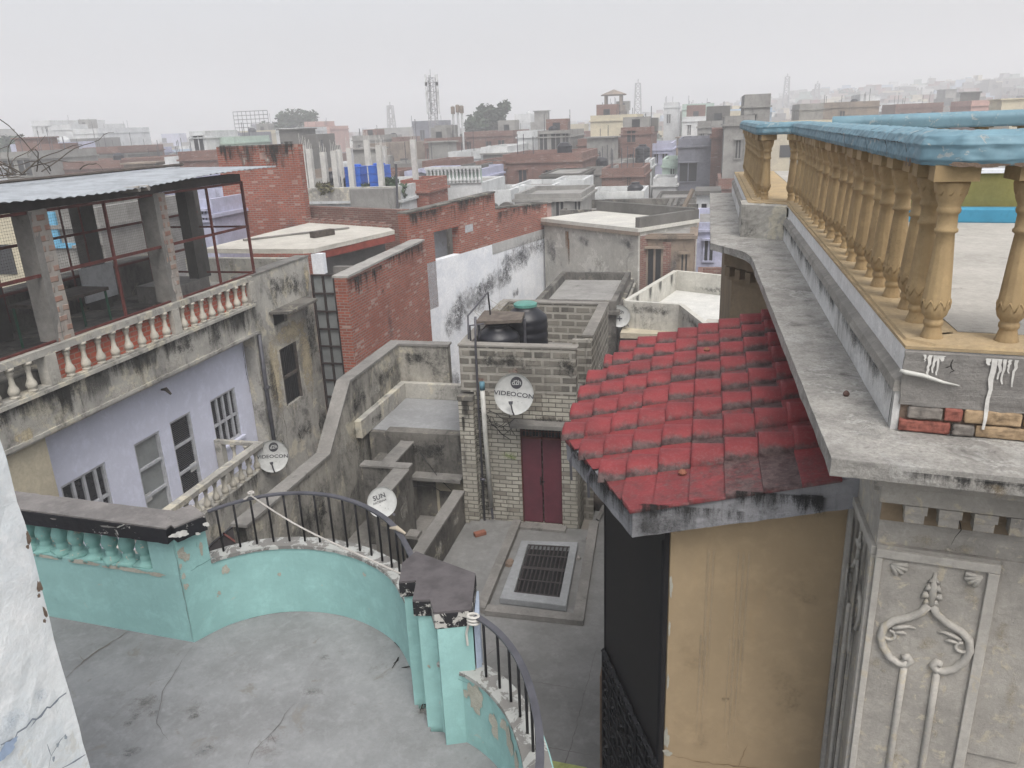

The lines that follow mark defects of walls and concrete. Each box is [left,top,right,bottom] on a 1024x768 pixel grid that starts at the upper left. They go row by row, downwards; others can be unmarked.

leakage [923,355,946,375]
leakage [986,358,1019,387]
spalling [897,404,1024,441]
leakage [641,503,711,533]
leakage [736,490,826,518]
peeling [168,522,209,590]
spalling [37,581,48,623]
crack [156,547,215,738]
peeling [463,683,519,768]